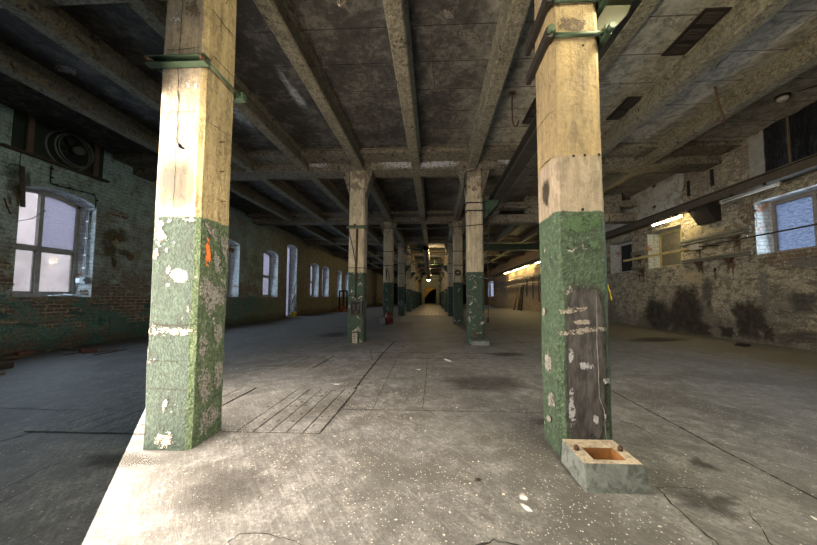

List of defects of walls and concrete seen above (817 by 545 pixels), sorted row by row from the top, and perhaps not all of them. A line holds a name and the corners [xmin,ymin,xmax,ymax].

peeling [79,217,229,431]
spalling [556,307,606,336]
peeling [568,348,594,370]
peeling [154,432,172,449]
crack [657,487,772,545]
crack [475,537,520,545]